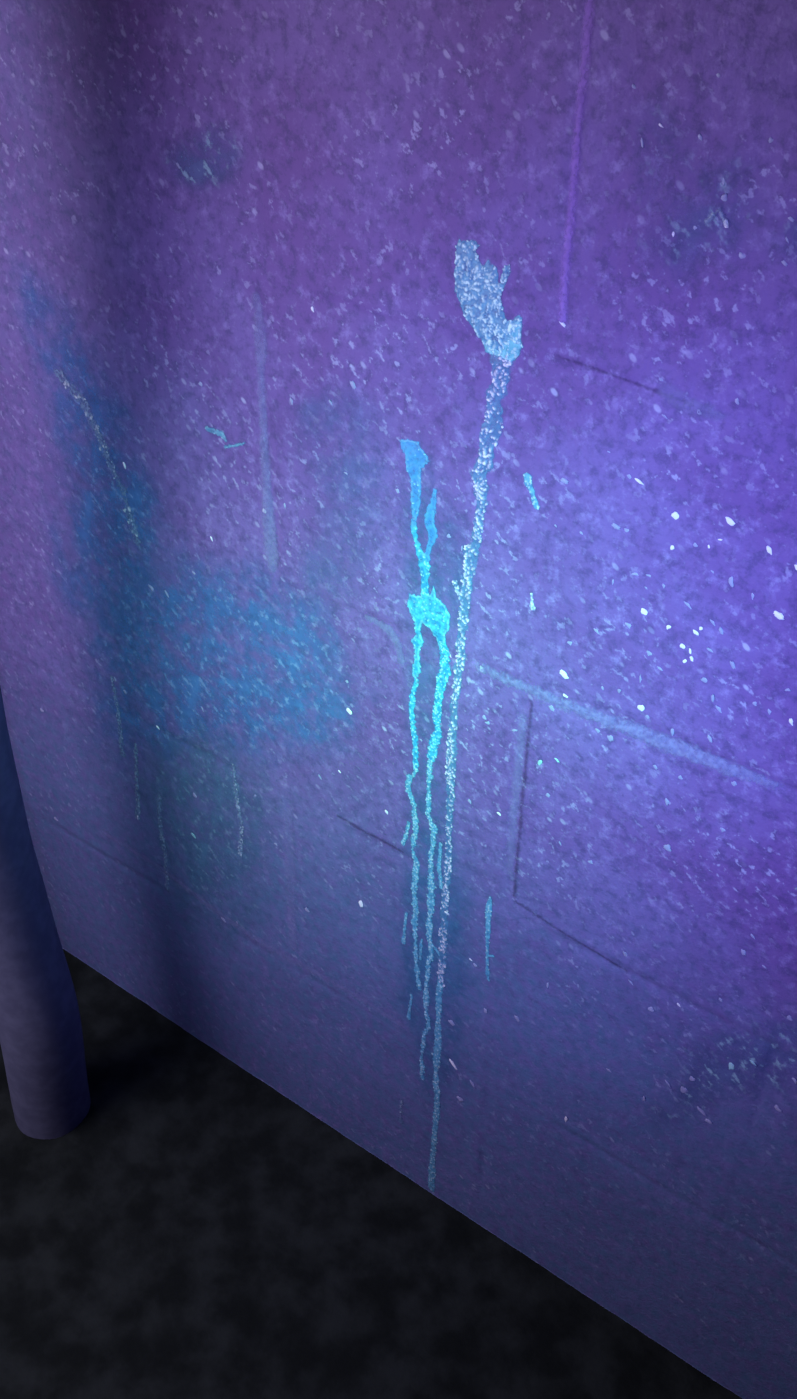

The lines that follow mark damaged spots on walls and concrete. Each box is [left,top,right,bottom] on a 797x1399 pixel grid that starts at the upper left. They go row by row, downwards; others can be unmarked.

water stain [400,240,523,1192]